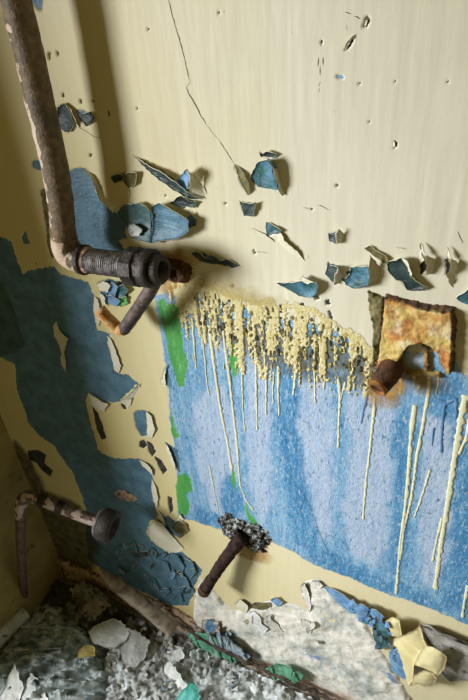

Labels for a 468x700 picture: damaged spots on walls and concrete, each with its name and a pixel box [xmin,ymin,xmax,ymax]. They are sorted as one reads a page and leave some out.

peeling [57,93,96,133]
crack [169,3,234,163]
peeling [70,155,207,251]
peeling [234,151,286,217]
rust [164,250,193,294]
damp [201,325,254,512]
peeling [0,188,468,700]
damp [254,347,280,430]
damp [337,378,346,448]
rust [371,344,443,401]
damp [395,375,459,595]